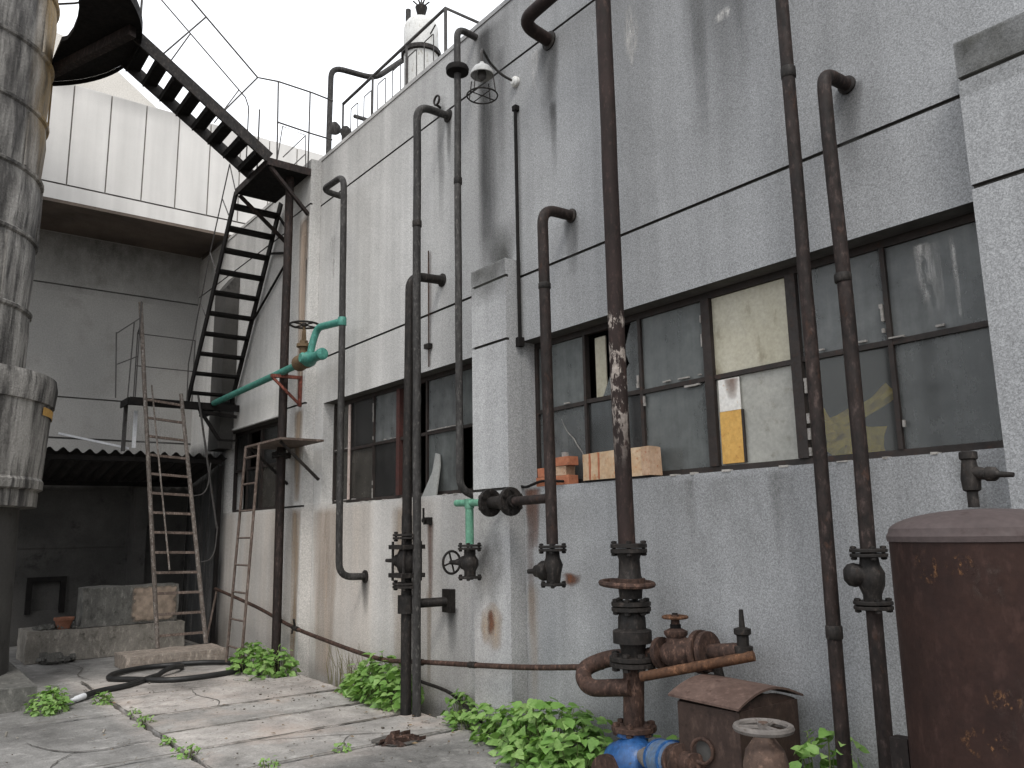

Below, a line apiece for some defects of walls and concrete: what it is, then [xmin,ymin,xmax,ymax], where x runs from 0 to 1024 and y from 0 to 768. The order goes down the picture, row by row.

damp [482,81,492,199]
rust [483,612,498,640]